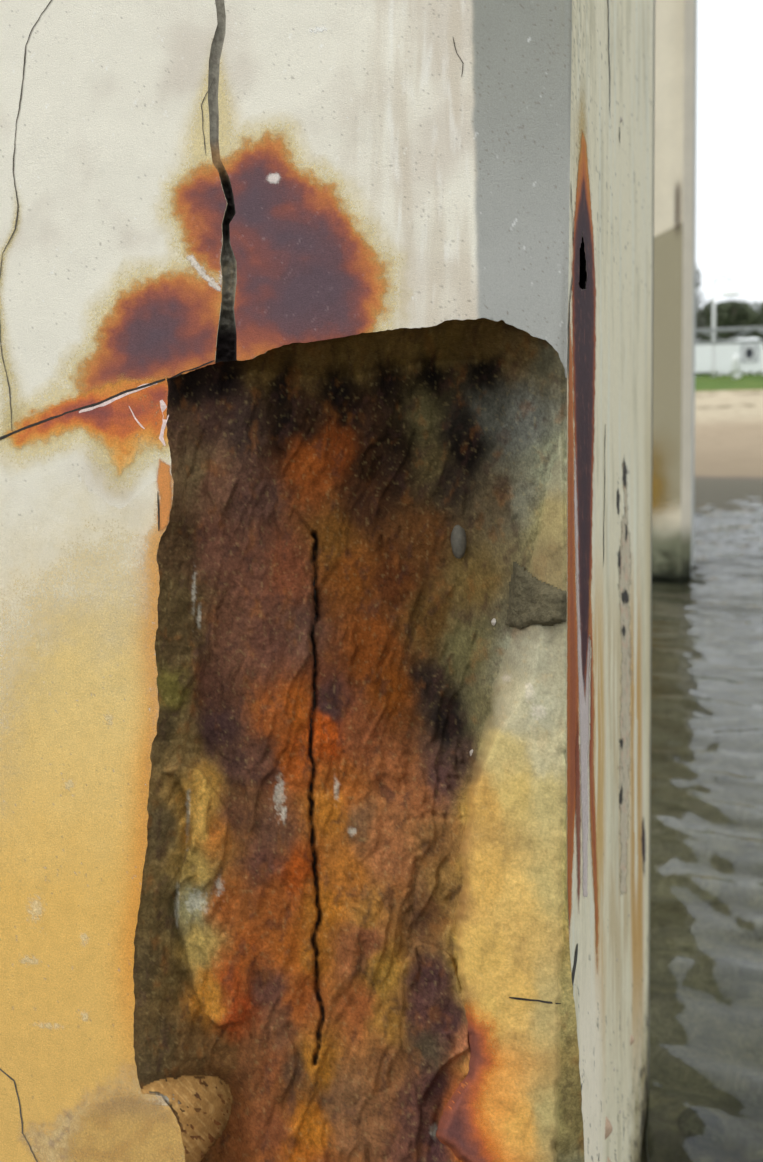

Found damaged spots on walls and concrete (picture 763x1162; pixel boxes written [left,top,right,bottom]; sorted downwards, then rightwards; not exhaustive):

crack [0,0,237,446]
corrosion [5,131,388,475]
spalling [133,318,585,1162]
corrosion [567,106,599,962]
crack [0,1069,38,1162]
corrosion [436,1005,503,1162]